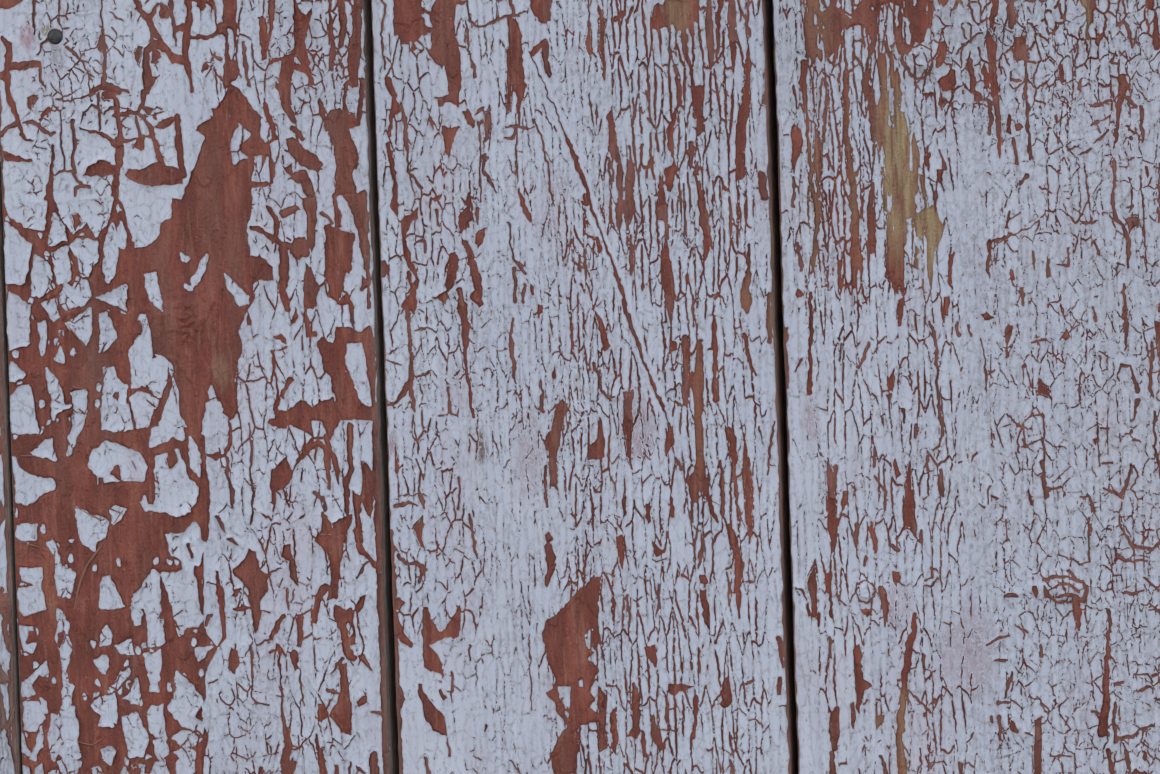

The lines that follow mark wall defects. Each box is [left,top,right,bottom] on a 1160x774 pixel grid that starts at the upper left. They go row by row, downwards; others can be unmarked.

crack [380,0,562,419]
peeling [501,0,560,128]
crack [588,0,757,284]
peeling [790,0,1002,396]
peeling [1137,0,1160,57]
peeling [0,0,491,774]
crack [385,307,485,565]
crack [540,457,567,508]
peeling [536,0,774,774]
crack [668,453,761,612]
peeling [768,626,787,697]
crack [754,0,1160,774]